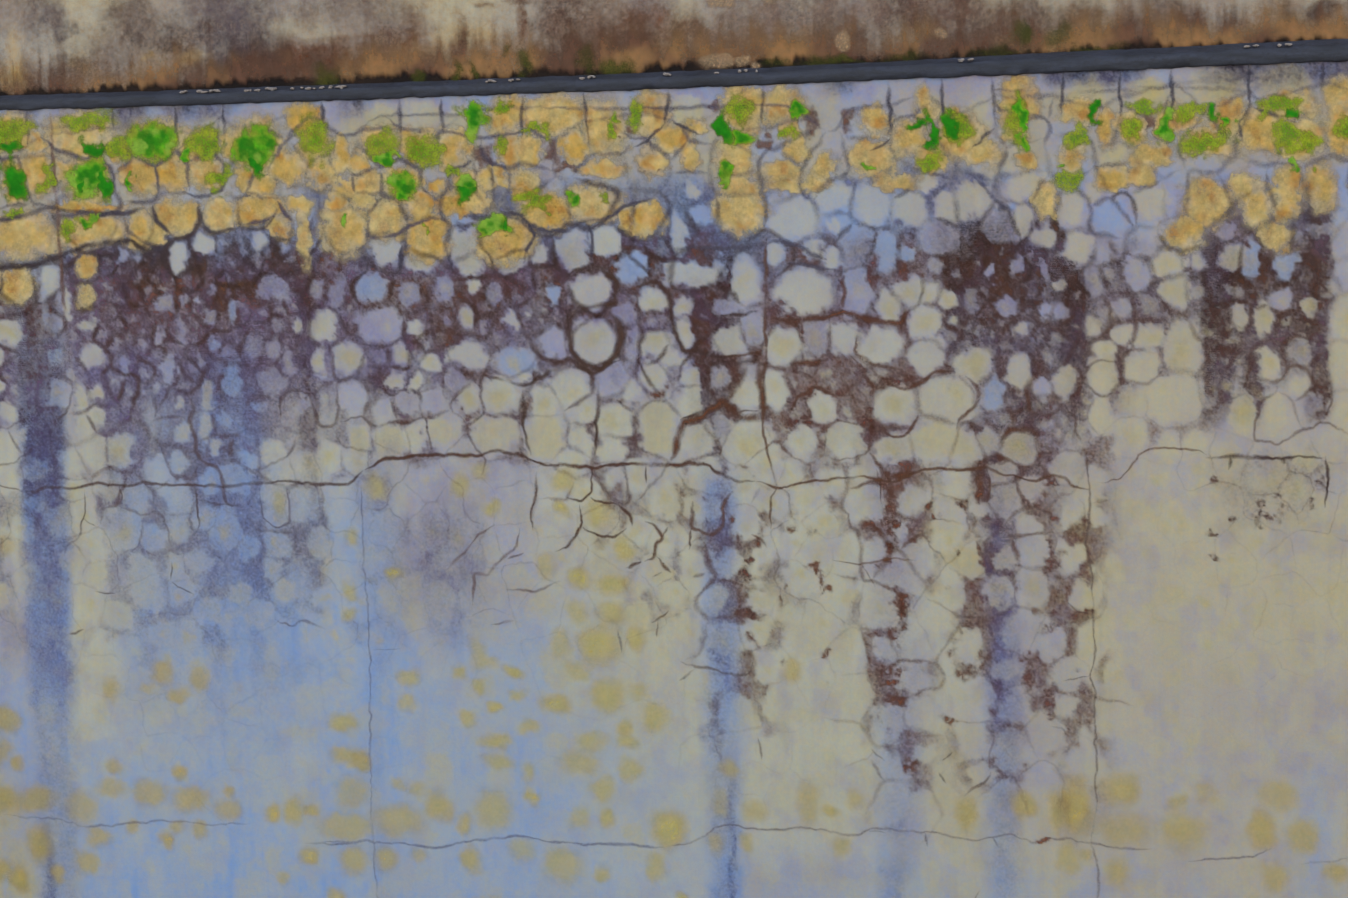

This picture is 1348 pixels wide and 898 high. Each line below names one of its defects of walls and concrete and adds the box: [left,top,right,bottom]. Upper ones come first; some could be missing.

leakage [0,0,1348,124]
crack [874,87,944,149]
crack [978,81,1065,144]
crack [0,99,1192,608]
leakage [867,201,1334,475]
leakage [0,183,766,612]
crack [1227,418,1329,501]
rust [863,517,901,562]
rust [889,593,909,639]
leakage [962,456,1020,726]
rust [878,667,905,705]
rust [1020,652,1054,720]